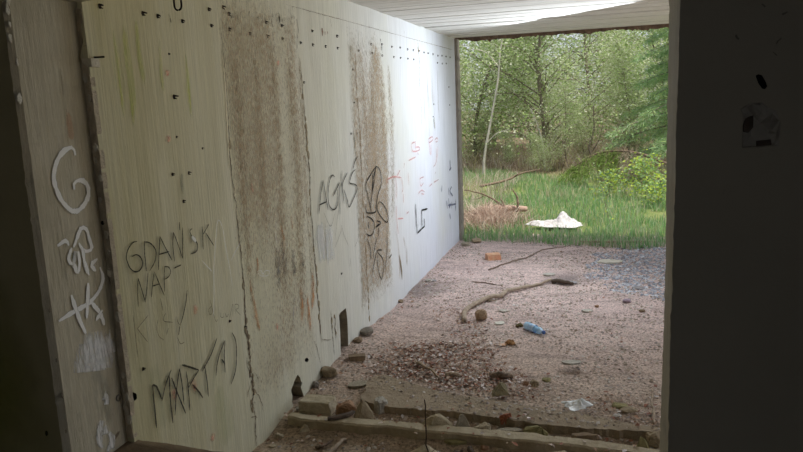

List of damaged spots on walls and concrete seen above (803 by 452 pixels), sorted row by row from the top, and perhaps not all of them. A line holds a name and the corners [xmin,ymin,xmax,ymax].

crack [220,28,263,446]